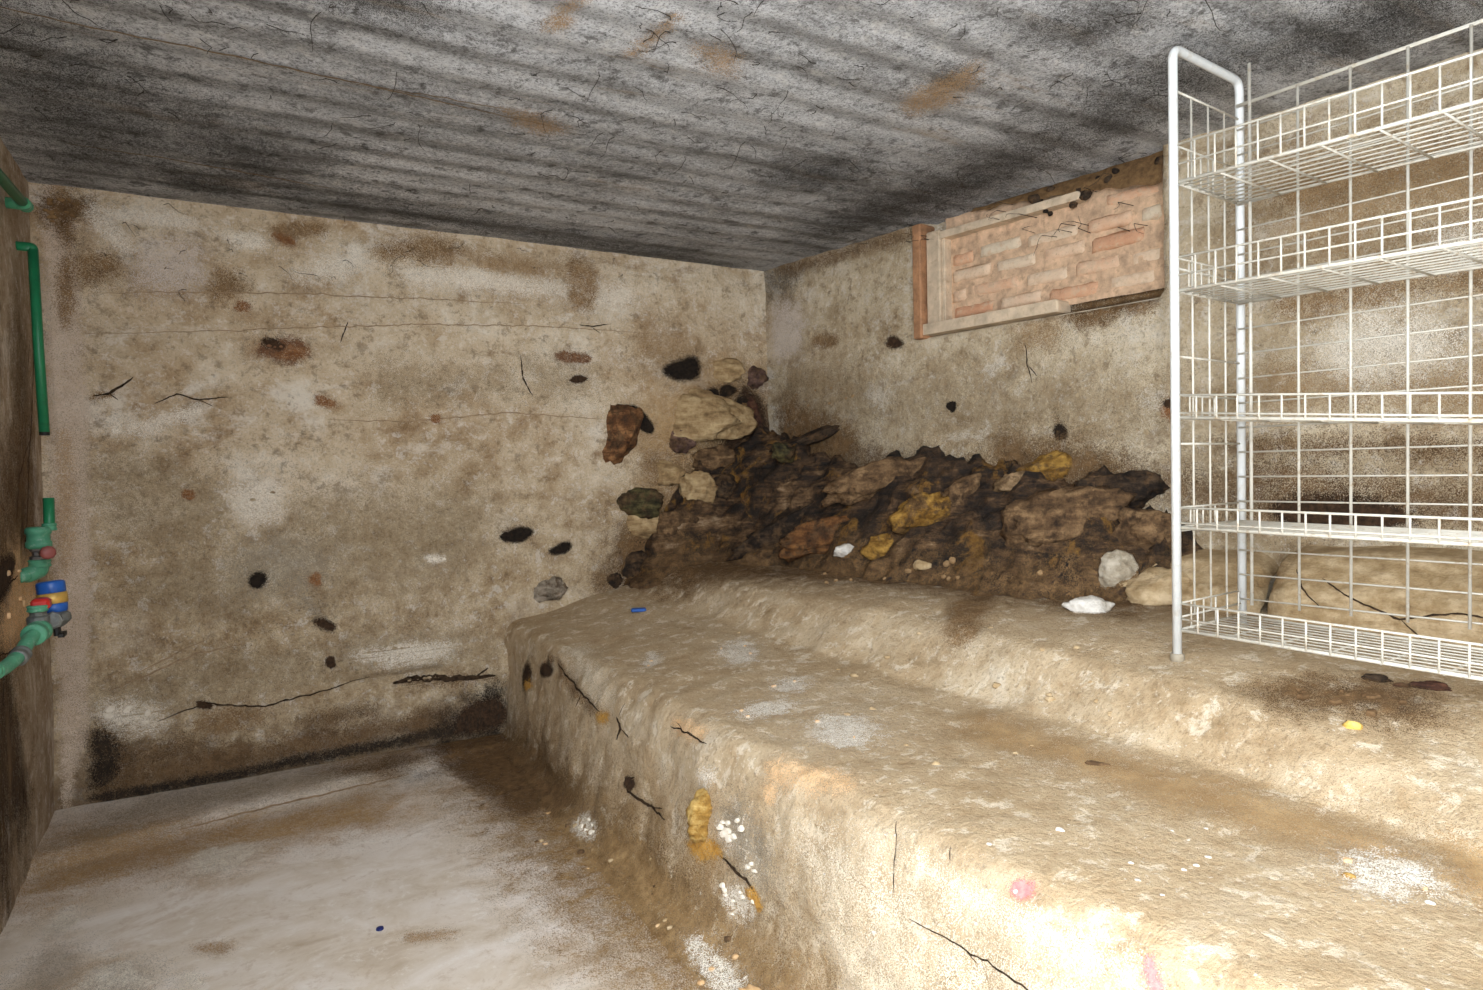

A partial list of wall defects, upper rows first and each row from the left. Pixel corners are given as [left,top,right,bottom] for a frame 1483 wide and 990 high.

water stain [0,0,1483,549]
water stain [0,418,546,931]
crack [393,668,499,690]
crack [556,655,628,740]
crack [623,775,665,820]
water stain [403,927,457,944]
crack [800,825,1028,990]